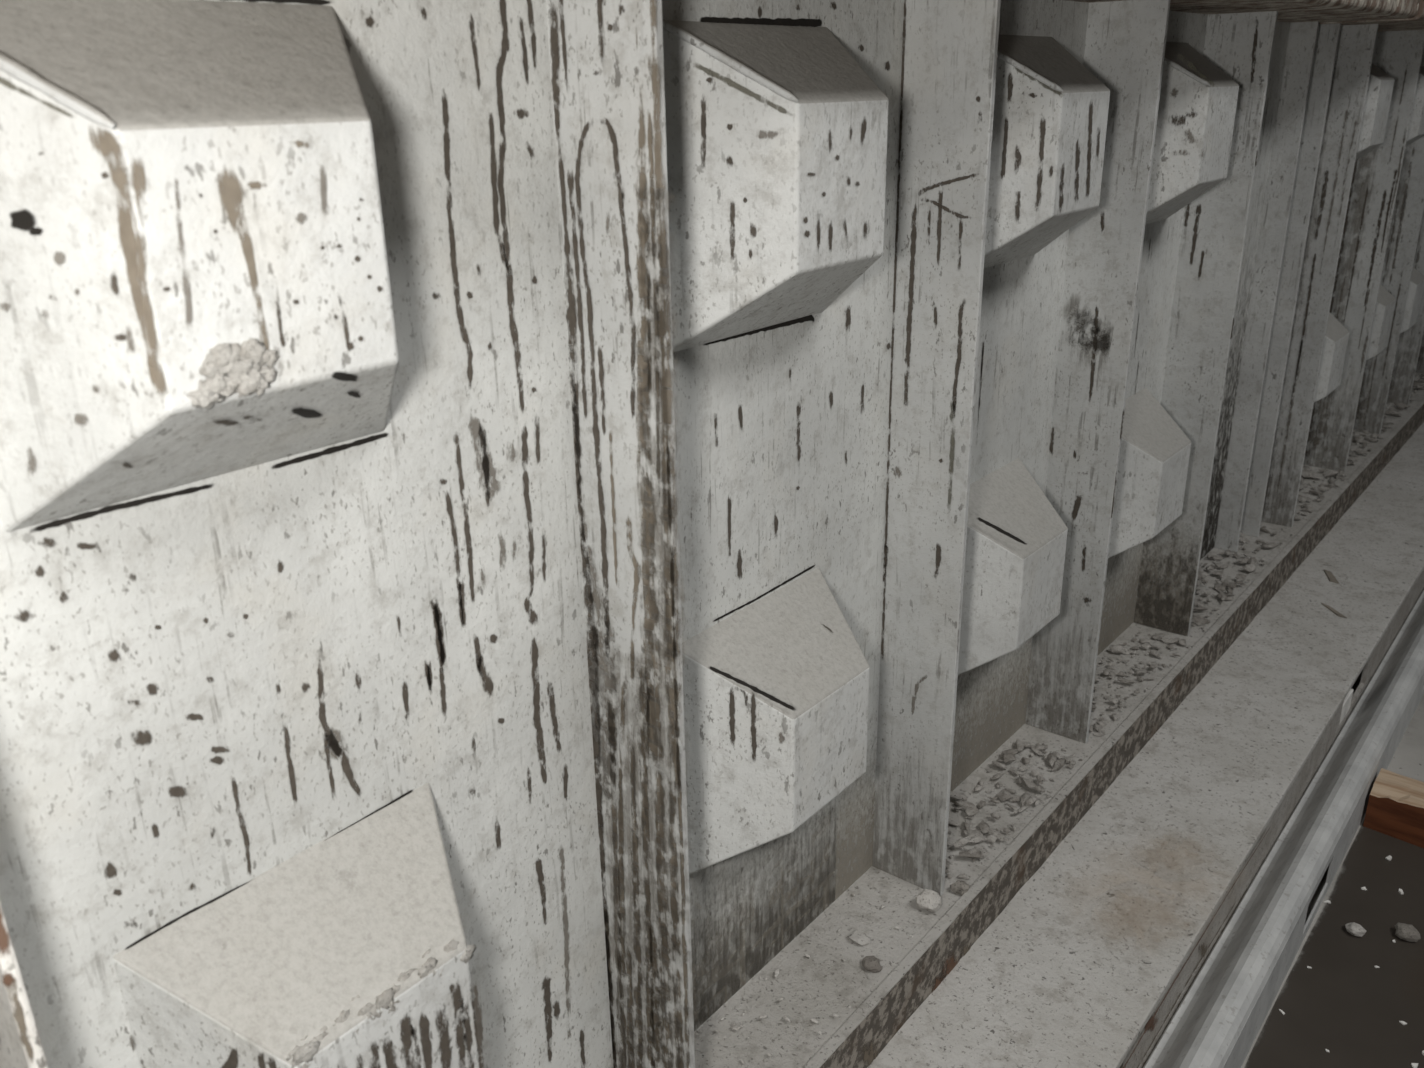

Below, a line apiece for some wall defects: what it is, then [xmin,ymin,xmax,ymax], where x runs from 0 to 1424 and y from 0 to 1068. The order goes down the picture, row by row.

water stain [850,118,867,142]
water stain [1001,118,1021,178]
water stain [1015,102,1100,220]
water stain [803,217,847,251]
water stain [881,0,975,658]
water stain [567,119,636,651]
water stain [728,497,742,579]
rust [0,912,9,955]
rust [3,973,33,1062]
water stain [222,1049,238,1068]
water stain [258,1054,276,1068]
water stain [357,985,484,1068]